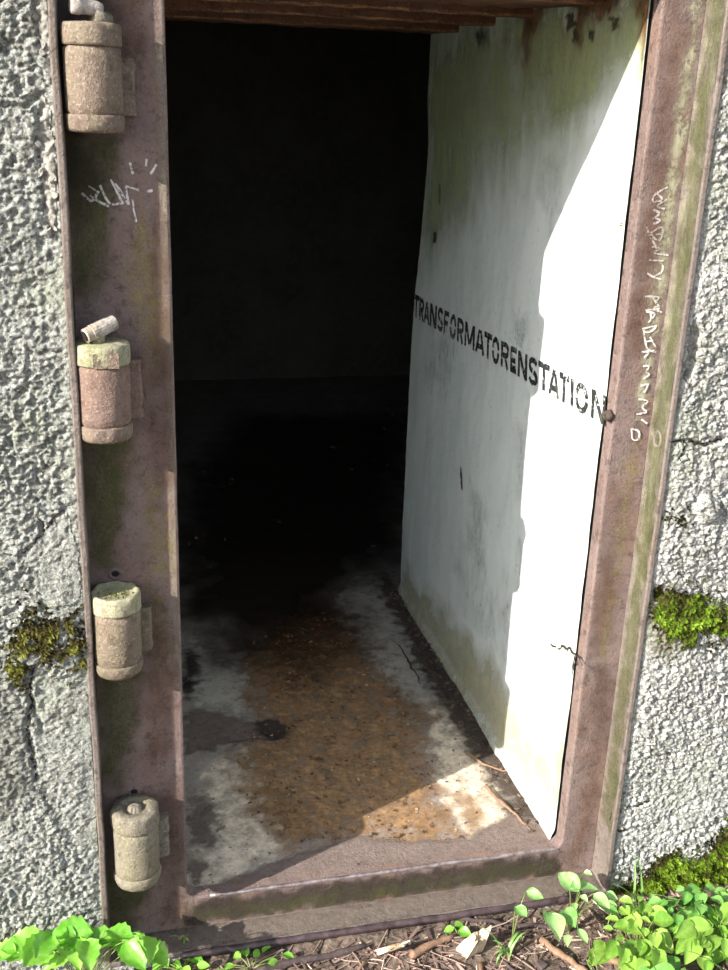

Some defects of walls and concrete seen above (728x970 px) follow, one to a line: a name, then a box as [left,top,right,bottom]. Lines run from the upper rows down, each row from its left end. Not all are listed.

corrosion [577,0,619,46]
crack [671,438,722,461]
water stain [570,531,587,647]
water stain [178,416,567,887]
spalling [553,646,574,676]
crack [25,665,40,781]